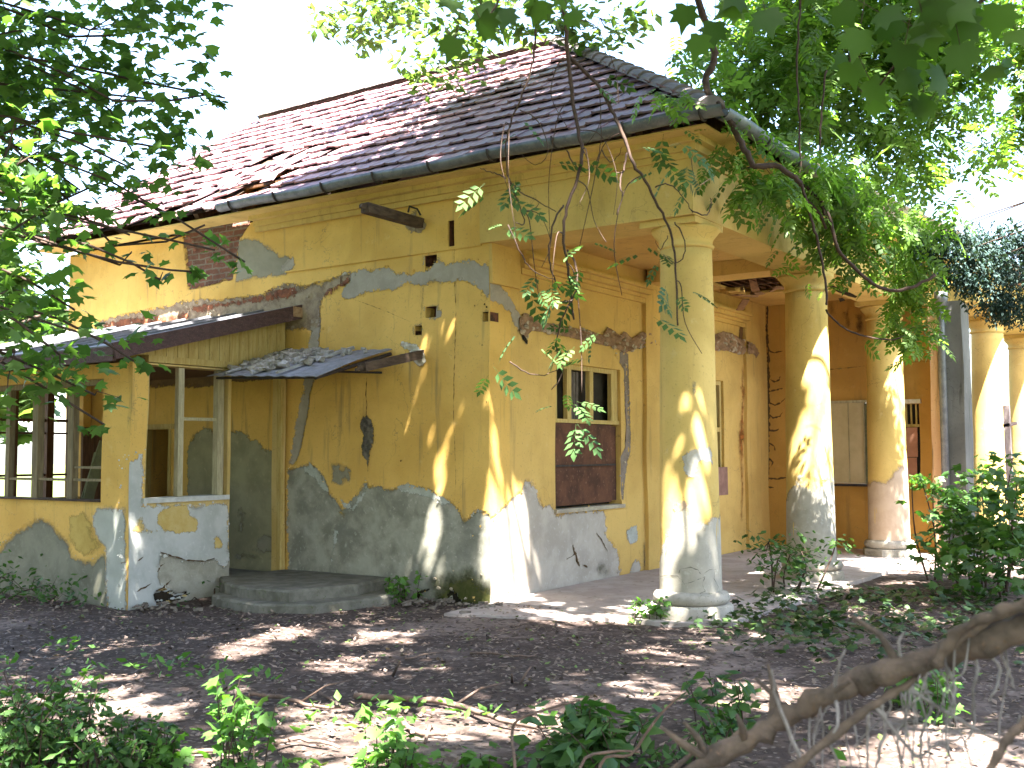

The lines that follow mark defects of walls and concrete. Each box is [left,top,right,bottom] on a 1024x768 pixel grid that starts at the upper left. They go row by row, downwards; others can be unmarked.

flaking render [96,211,351,348]
spalling [423,254,438,267]
flaking render [400,306,442,367]
peeling [117,449,230,610]
flaking render [285,379,643,603]
flaking render [660,501,722,593]
flaking render [786,467,837,561]
flaking render [868,465,911,541]